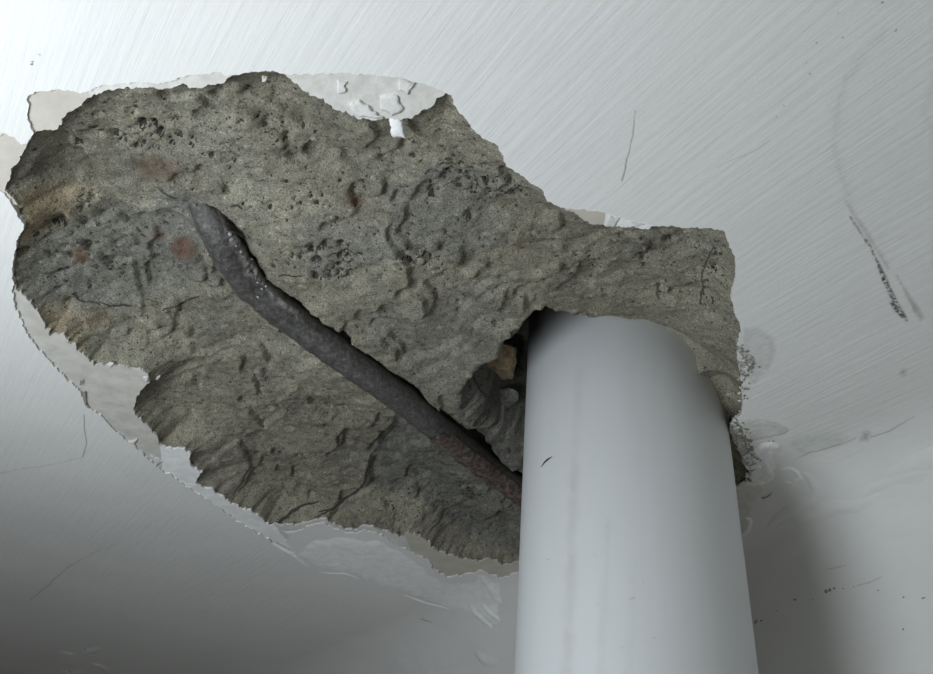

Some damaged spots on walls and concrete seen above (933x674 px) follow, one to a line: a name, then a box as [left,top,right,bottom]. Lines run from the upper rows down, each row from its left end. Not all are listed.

crack [0,380,88,474]
spalling [0,71,761,577]